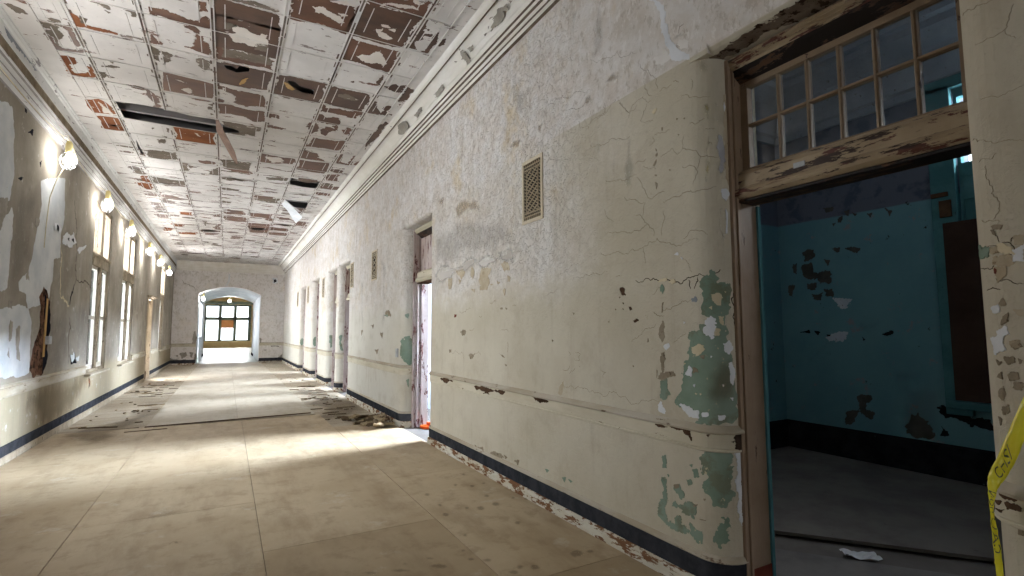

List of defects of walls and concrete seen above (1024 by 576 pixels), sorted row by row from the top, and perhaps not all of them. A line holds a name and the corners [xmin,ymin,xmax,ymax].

peeling [709,0,839,59]
peeling [4,0,446,261]
spalling [0,197,8,230]
crack [548,53,721,337]
spalling [448,261,511,310]
peeling [788,247,860,309]
spalling [7,287,51,378]
peeling [400,336,412,365]
spalling [905,224,1024,440]
peeling [647,269,743,549]
spalling [845,394,875,425]